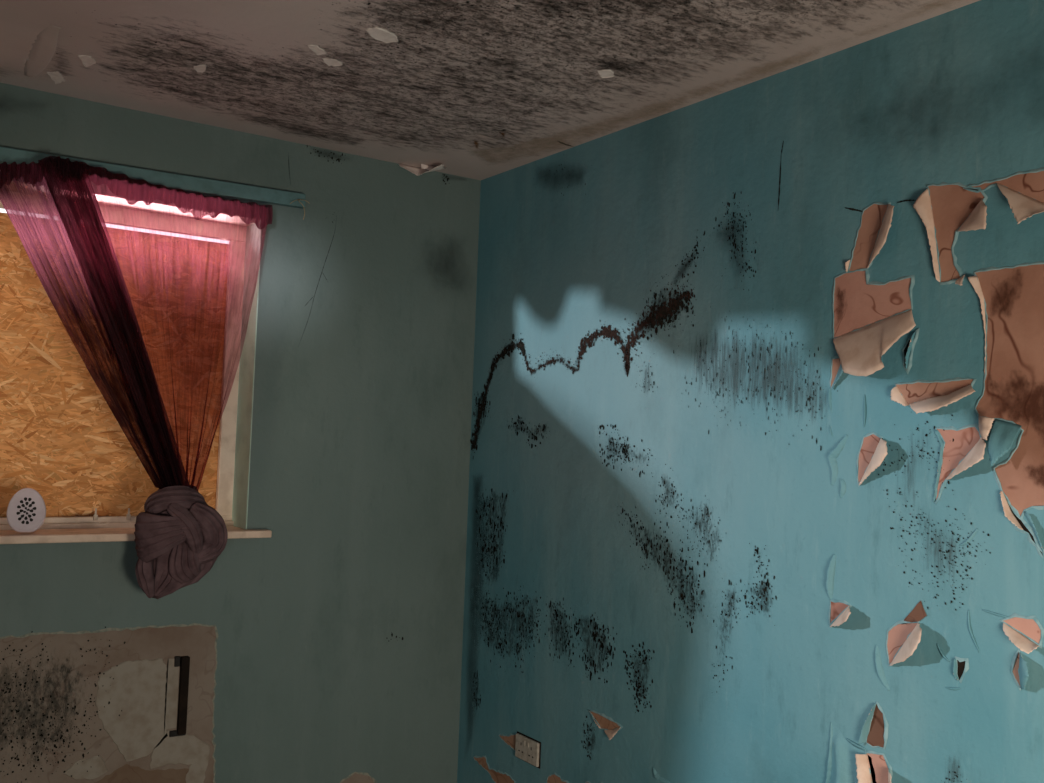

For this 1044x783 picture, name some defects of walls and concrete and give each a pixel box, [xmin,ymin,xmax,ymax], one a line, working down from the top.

leakage [107,0,847,164]
leakage [470,231,705,458]
peeling [829,167,1044,560]
leakage [0,631,118,783]
leakage [476,489,655,713]
peeling [588,710,623,740]
leakage [598,424,777,633]
peeling [828,599,852,627]
peeling [855,702,893,783]
peeling [885,601,927,666]
leakage [883,488,991,610]
peeling [1000,613,1044,690]